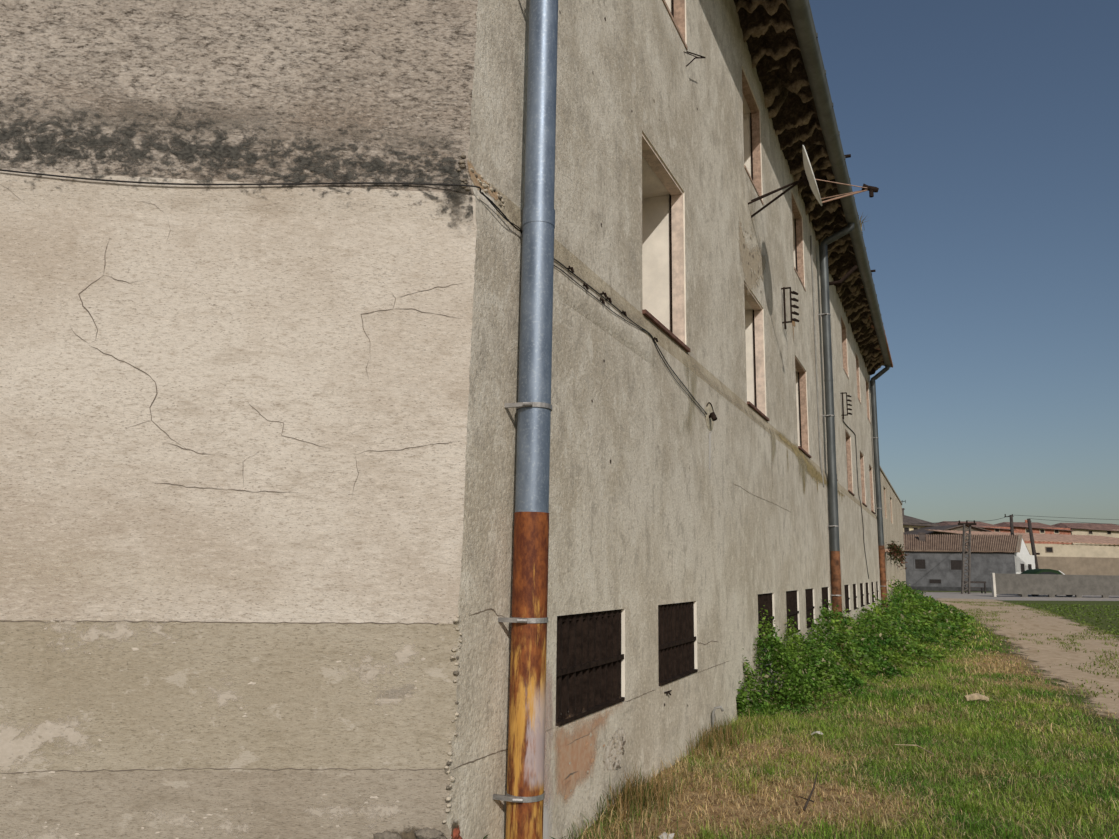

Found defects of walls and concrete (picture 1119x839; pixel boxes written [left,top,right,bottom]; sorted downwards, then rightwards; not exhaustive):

leakage [0,97,473,224]
crack [72,236,214,455]
crack [152,453,283,493]
crack [249,404,328,448]
crack [352,441,455,495]
corrosion [830,551,843,629]
corrosion [505,512,549,839]
peeling [556,712,626,799]